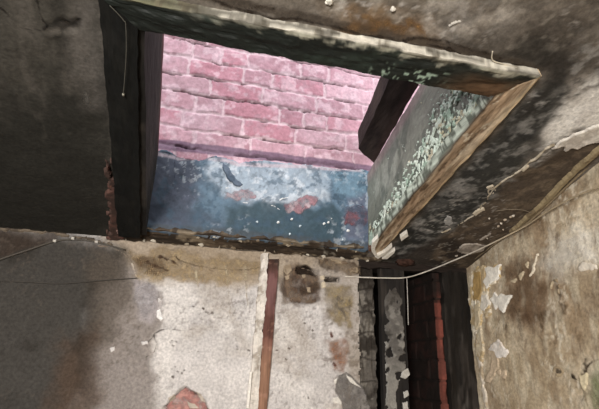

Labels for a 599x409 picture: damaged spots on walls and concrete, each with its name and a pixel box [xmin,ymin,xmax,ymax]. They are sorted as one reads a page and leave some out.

flaking render [98,158,125,247]
peeling [271,195,318,220]
peeling [468,264,513,409]
flaking render [165,388,208,409]